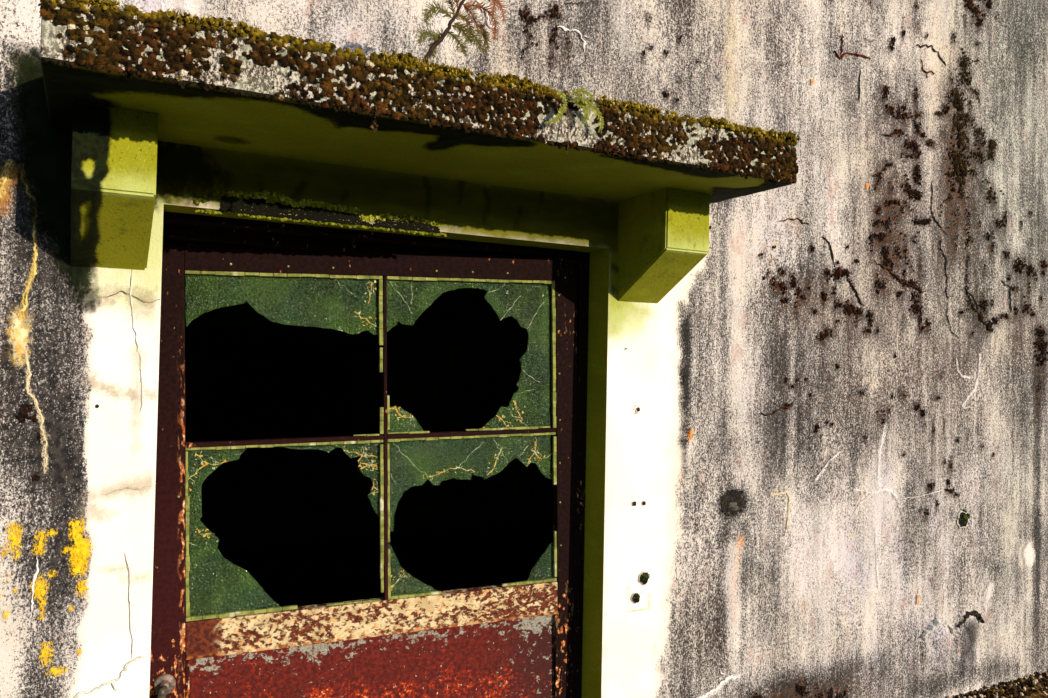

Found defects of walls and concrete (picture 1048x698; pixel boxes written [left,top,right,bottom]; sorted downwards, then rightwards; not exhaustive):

leakage [6,47,536,312]
leakage [600,155,791,204]
leakage [7,312,29,362]
leakage [677,300,693,477]
crack [874,182,1012,409]
leakage [722,539,744,648]
crack [815,452,839,490]
crack [851,424,941,588]
leakage [1023,543,1036,568]